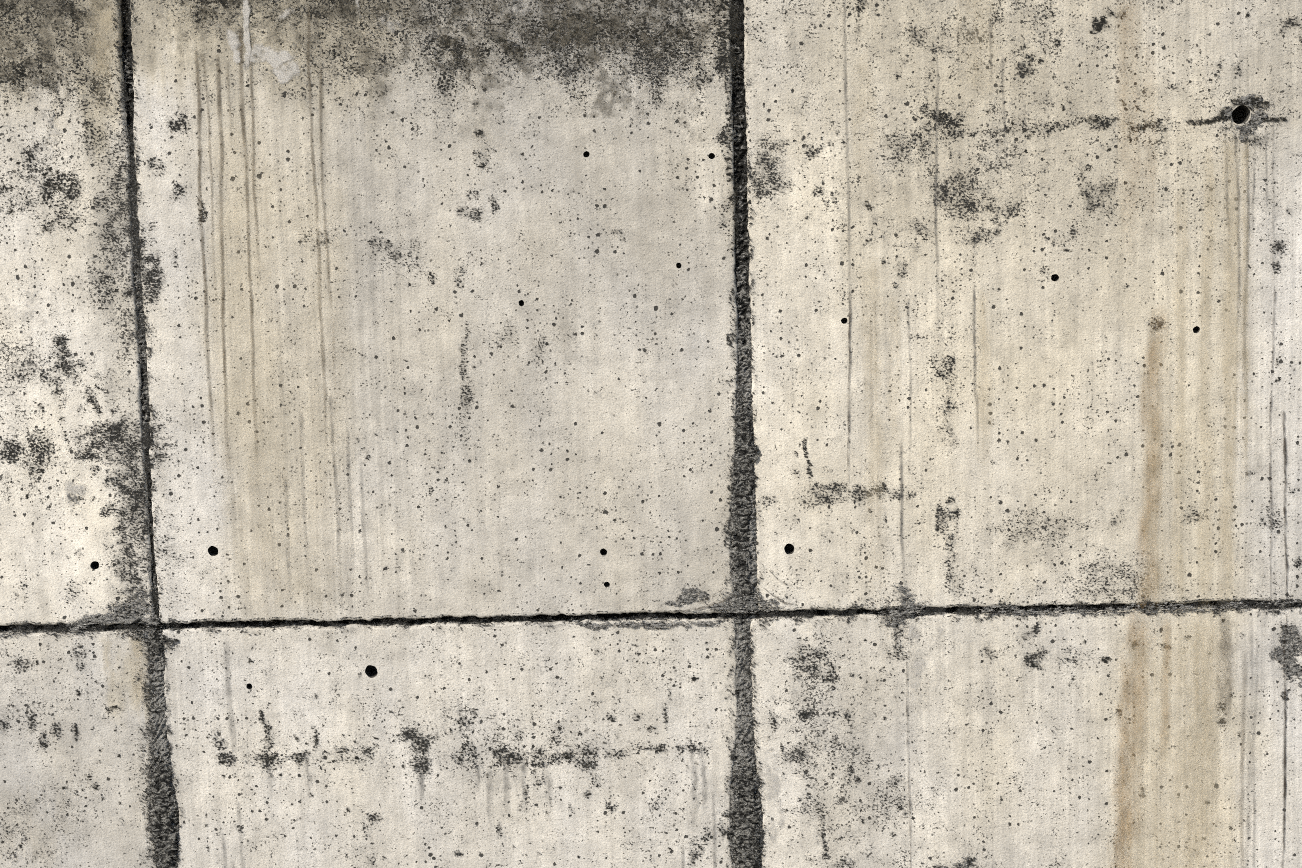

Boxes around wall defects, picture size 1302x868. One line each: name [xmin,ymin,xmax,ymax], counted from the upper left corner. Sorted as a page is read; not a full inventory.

leakage [881,20,953,88]
leakage [1014,44,1056,85]
leakage [1090,0,1154,34]
leakage [162,0,845,440]
leakage [880,100,1176,291]
leakage [1269,240,1290,274]
leakage [0,0,710,868]
leakage [925,354,960,456]
leakage [687,438,1302,868]